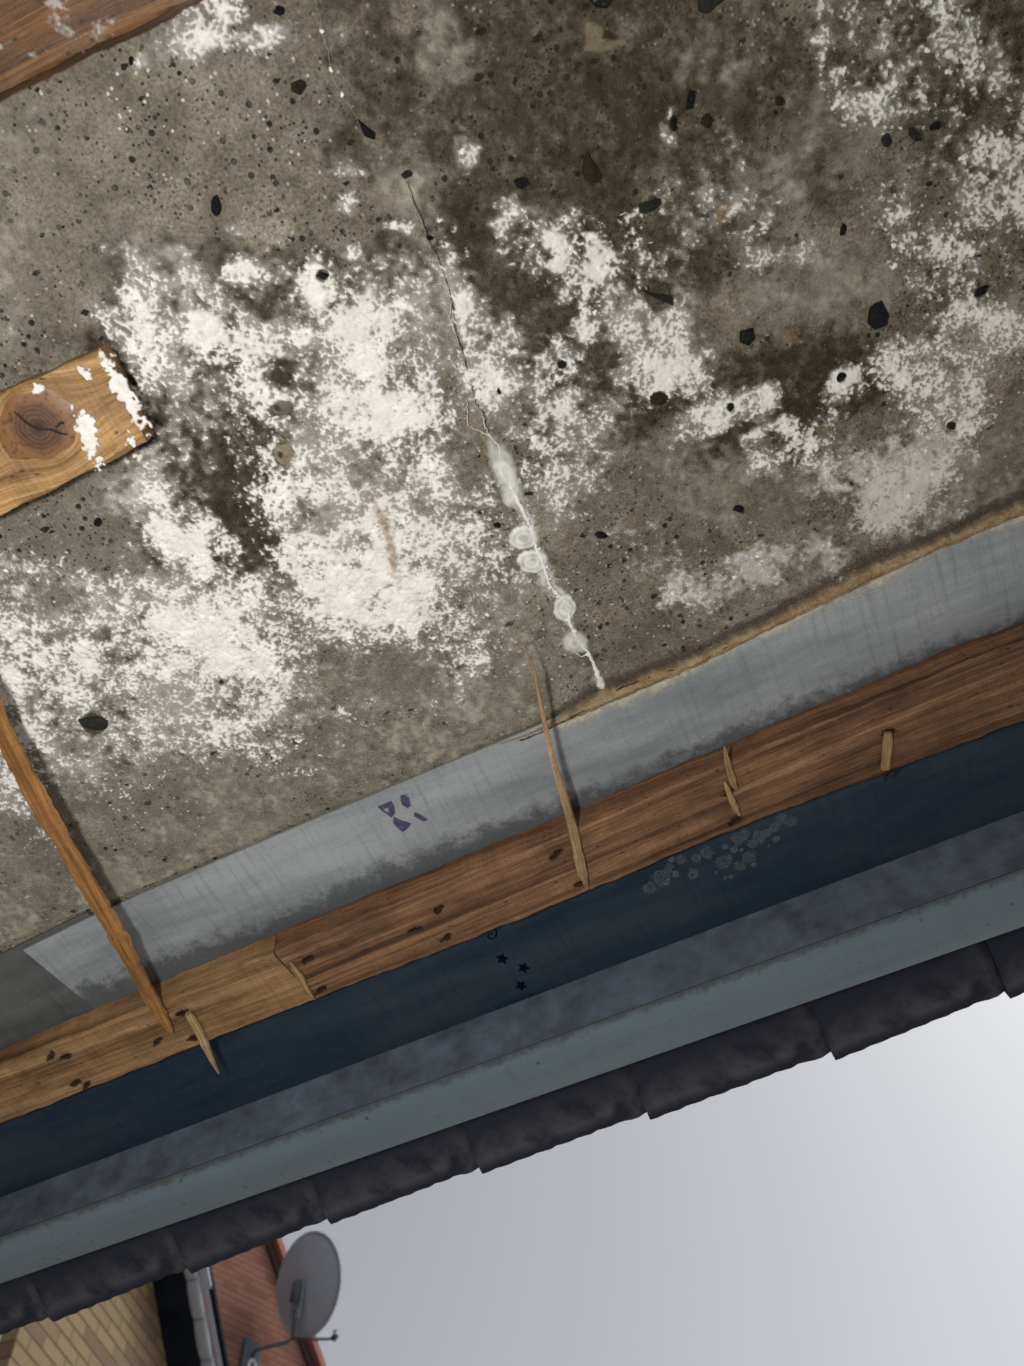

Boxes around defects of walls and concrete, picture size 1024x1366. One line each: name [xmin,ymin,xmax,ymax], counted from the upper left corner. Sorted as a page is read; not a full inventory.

crack [315,0,359,120]
crack [408,184,500,455]
leakage [0,0,1024,900]
crack [509,486,674,741]
leakage [0,750,89,944]